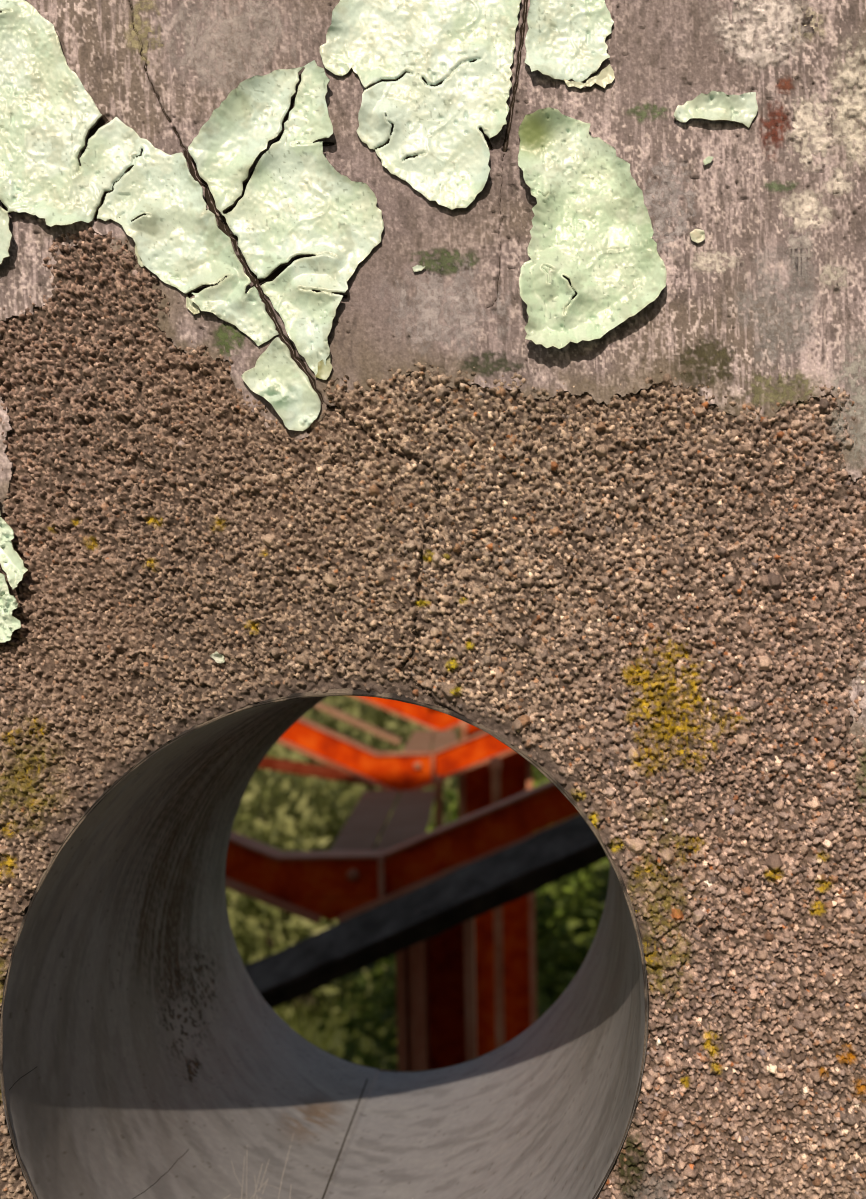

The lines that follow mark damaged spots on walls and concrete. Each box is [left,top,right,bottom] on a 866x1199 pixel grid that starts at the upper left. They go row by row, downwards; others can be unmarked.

peeling [524,0,615,89]
peeling [0,0,279,346]
peeling [188,0,522,380]
crack [481,0,528,308]
peeling [518,107,667,349]
peeling [690,229,705,243]
peeling [241,337,321,431]
crack [128,0,449,709]
peeling [0,573,21,643]
peeling [0,517,28,590]
peeling [210,651,225,664]
spalling [0,1083,34,1199]